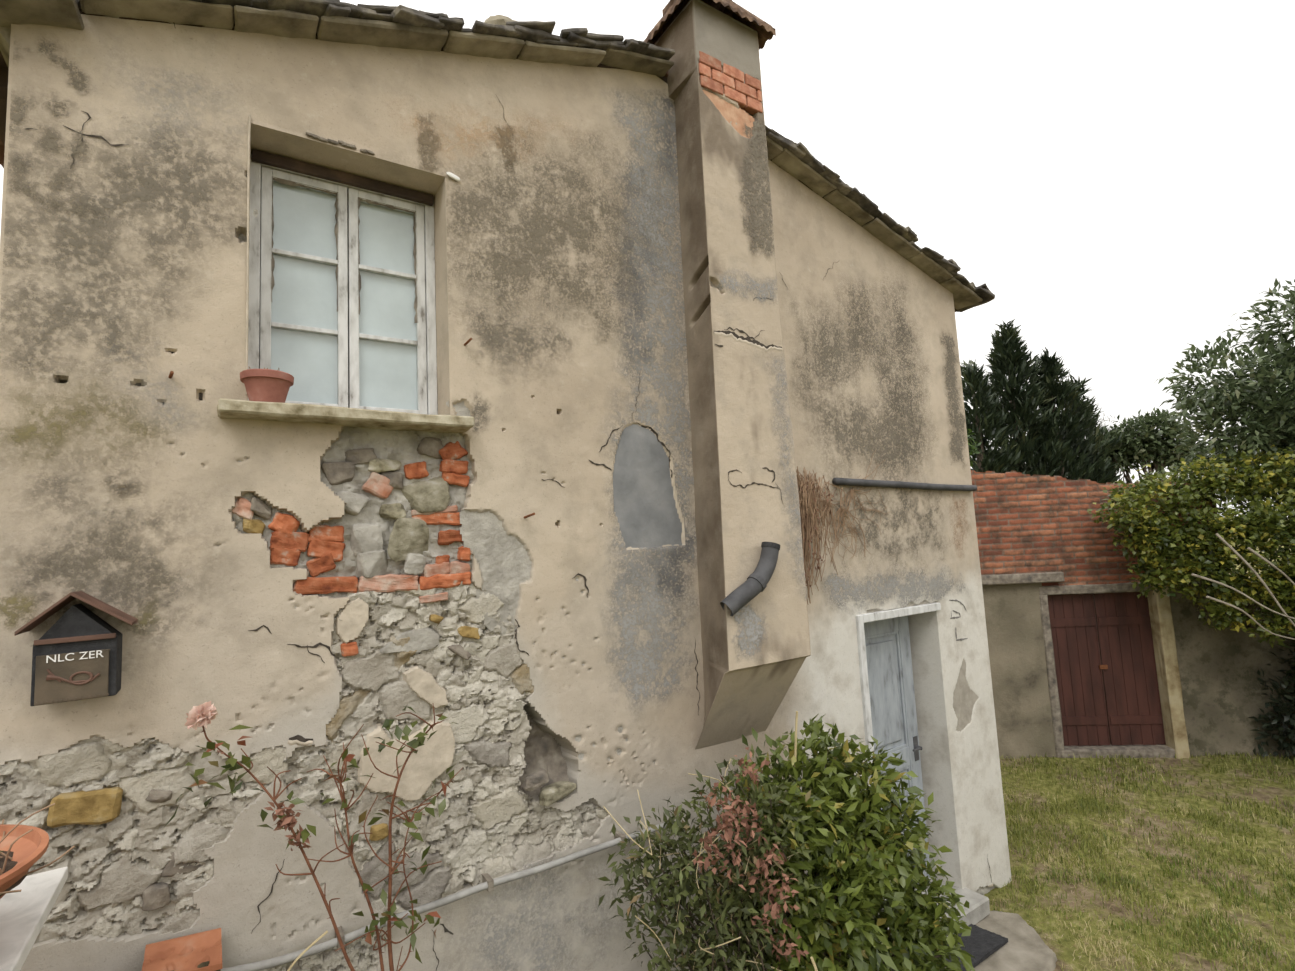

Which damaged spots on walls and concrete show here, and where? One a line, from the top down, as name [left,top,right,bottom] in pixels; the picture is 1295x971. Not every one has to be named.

crack [26,111,129,169]
damp [0,97,239,372]
flaking render [698,51,763,139]
damp [741,121,775,256]
crack [714,273,787,352]
damp [799,291,922,469]
damp [941,336,966,461]
peeling [613,424,682,548]
crack [728,467,783,502]
spalling [0,426,608,944]
peeling [953,659,979,732]
spalling [269,932,385,971]